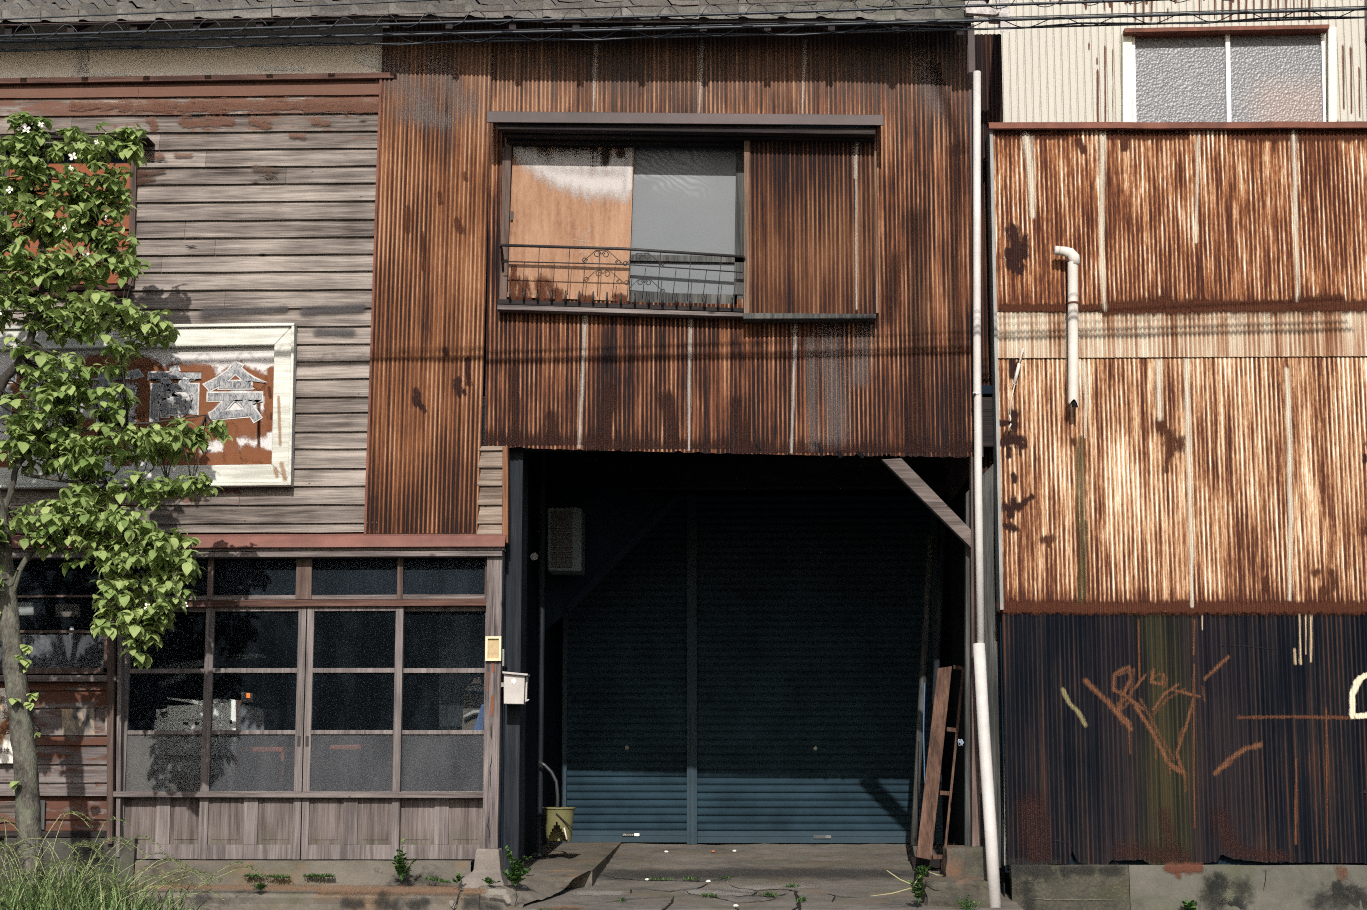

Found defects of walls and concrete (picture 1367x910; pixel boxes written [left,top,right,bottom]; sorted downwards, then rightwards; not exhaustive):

corrosion [1199,0,1311,22]
corrosion [1088,44,1190,151]
corrosion [1230,27,1367,143]
corrosion [994,130,1086,154]
corrosion [485,65,974,457]
corrosion [1004,223,1029,275]
corrosion [999,293,1367,316]
corrosion [1009,358,1019,379]
corrosion [999,409,1034,532]
corrosion [1155,419,1185,473]
corrosion [998,568,1367,829]
crack [604,875,861,910]